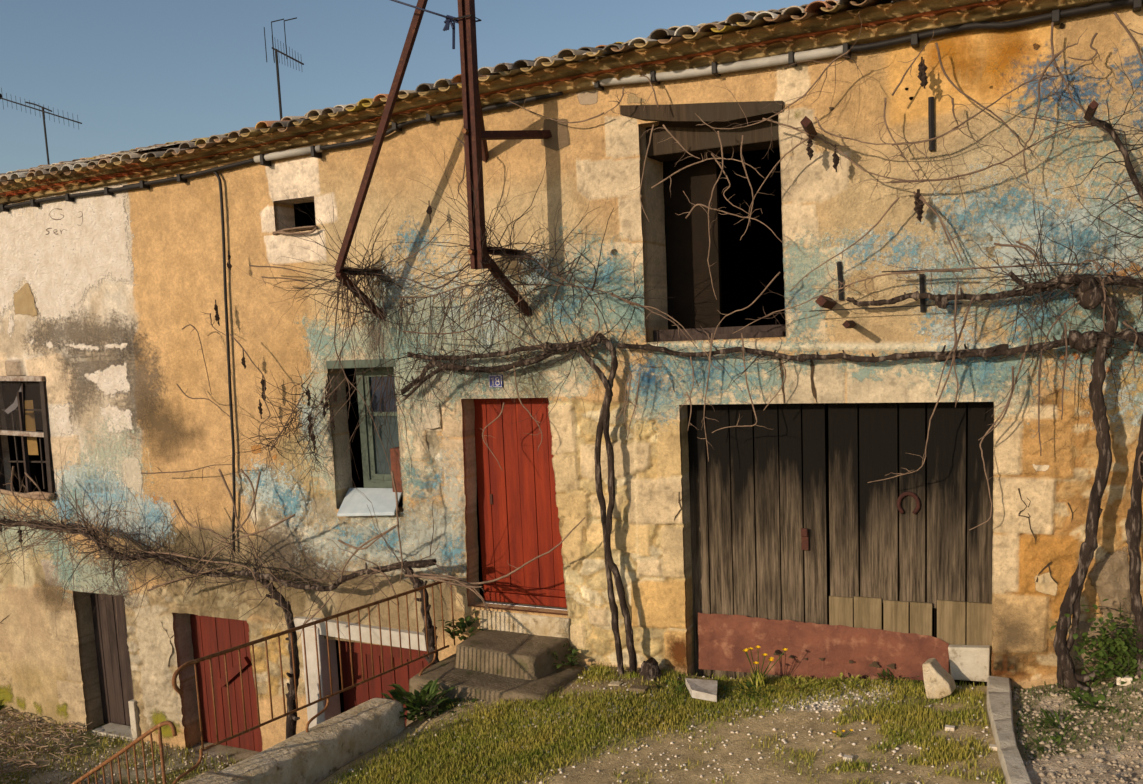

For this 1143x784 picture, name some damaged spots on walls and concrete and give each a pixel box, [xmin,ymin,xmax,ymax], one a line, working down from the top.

peeling [0,172,136,338]
peeling [28,337,135,436]
water stain [0,314,194,609]
peeling [119,451,162,508]
spalling [1034,572,1057,596]